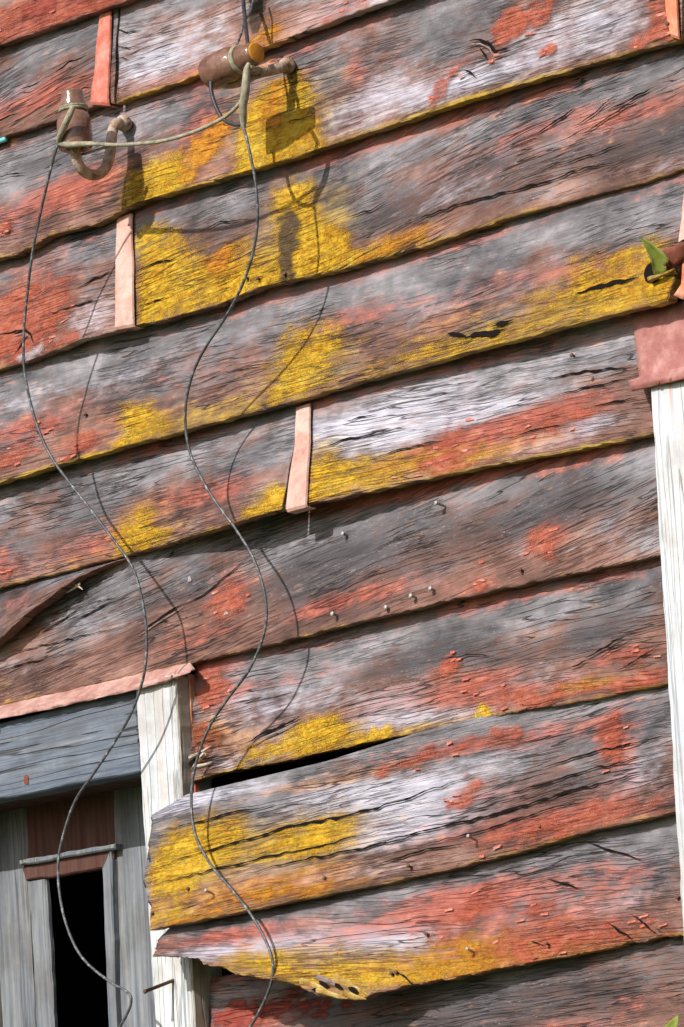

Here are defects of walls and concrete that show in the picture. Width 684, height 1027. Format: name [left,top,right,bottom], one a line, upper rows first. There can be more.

crack [387,84,658,234]
peeling [413,417,477,477]
peeling [525,408,594,439]
crack [148,738,661,885]
crack [607,915,656,942]